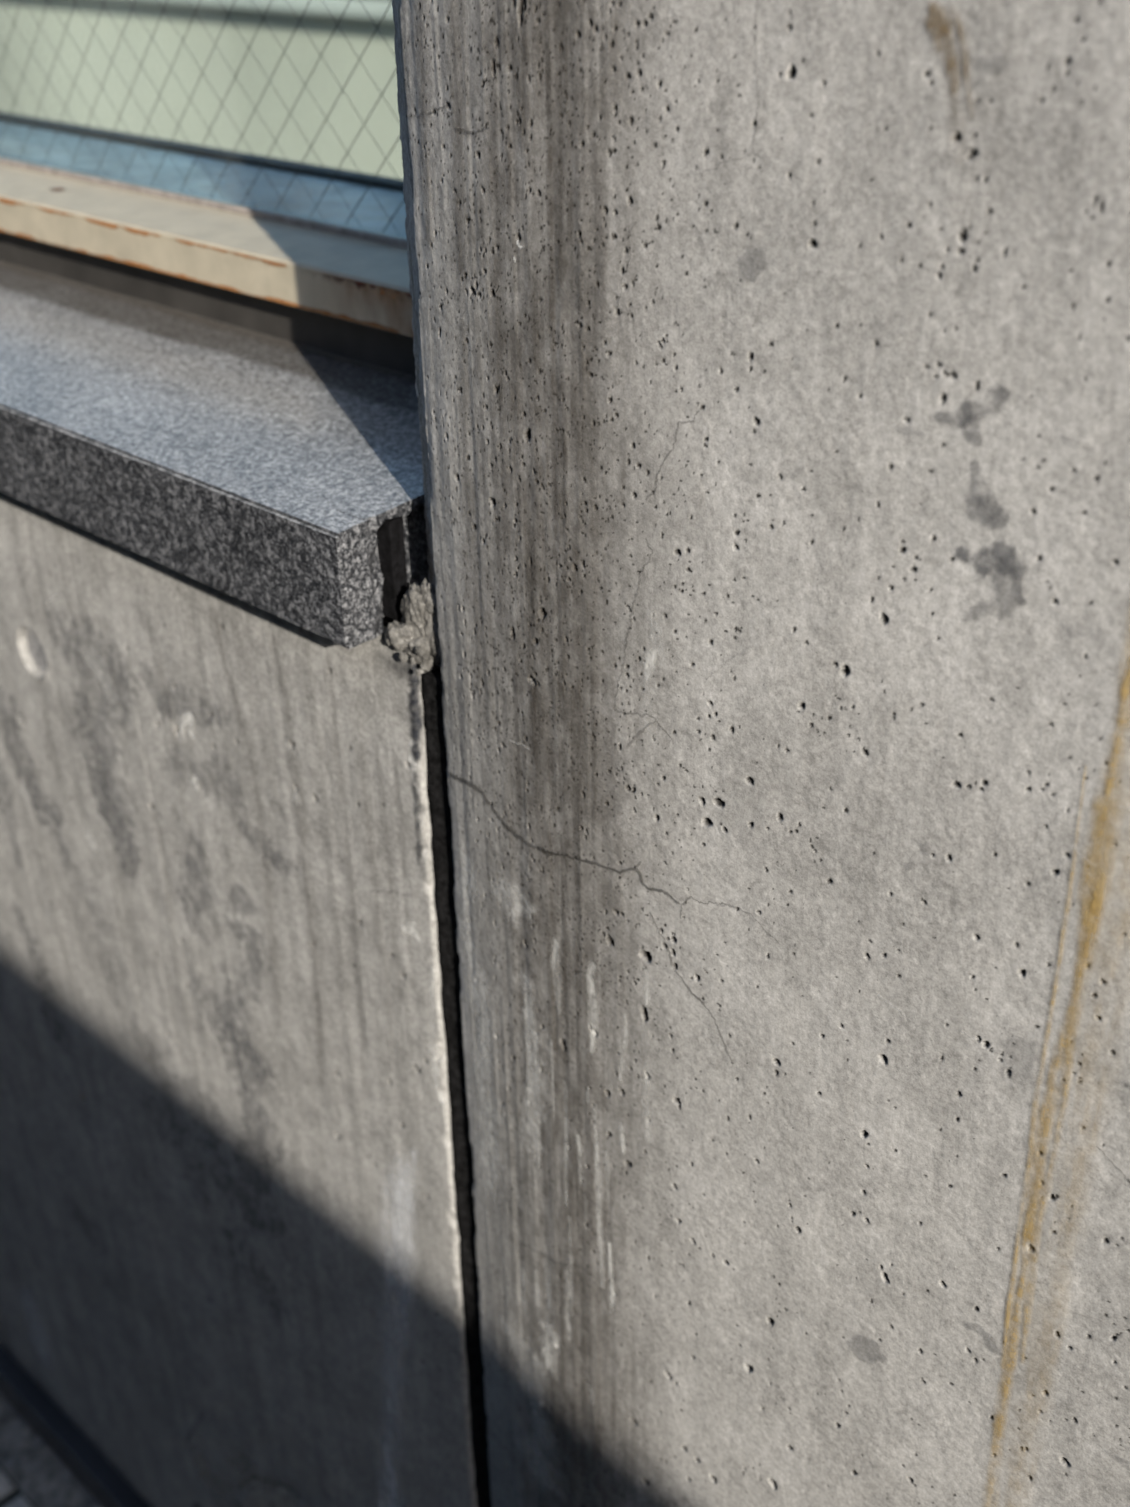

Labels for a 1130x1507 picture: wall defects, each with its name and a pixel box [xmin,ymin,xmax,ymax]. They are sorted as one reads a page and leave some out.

leakage [511,0,582,114]
leakage [943,402,972,427]
leakage [957,498,1018,577]
leakage [645,651,655,679]
leakage [494,120,614,1507]
rust [1067,669,1130,978]
efflorescence [459,847,497,1194]